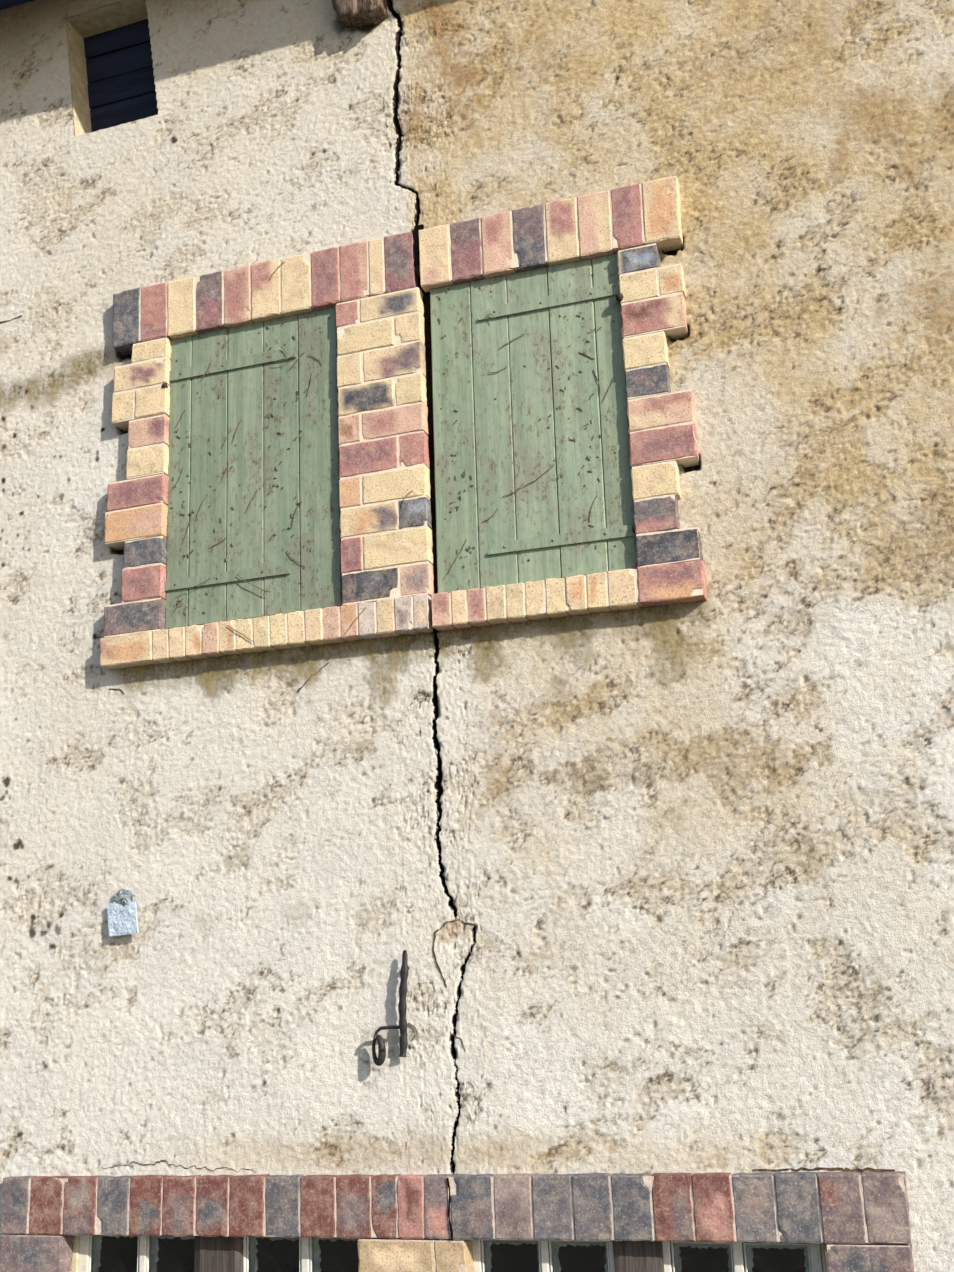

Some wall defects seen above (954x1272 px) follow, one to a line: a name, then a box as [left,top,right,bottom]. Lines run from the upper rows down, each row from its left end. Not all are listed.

crack [386,0,438,594]
crack [432,628,476,1241]